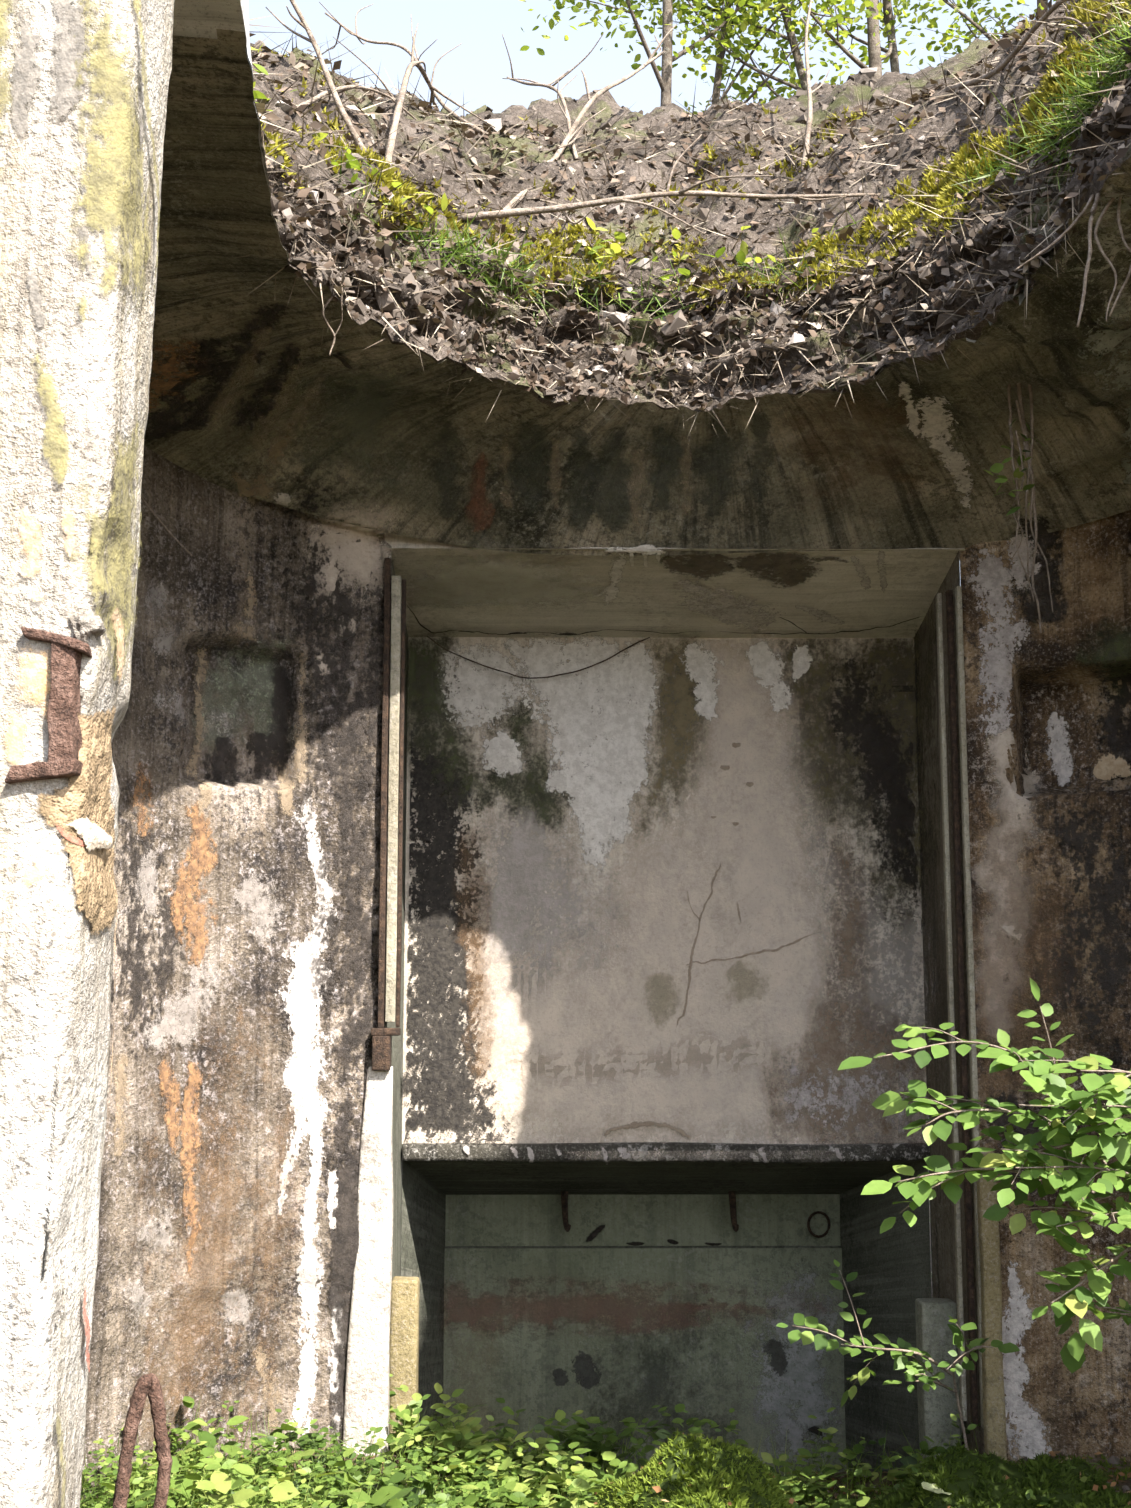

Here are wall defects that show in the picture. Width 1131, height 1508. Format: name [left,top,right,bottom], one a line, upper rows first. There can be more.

rust [24,656,51,711]
spalling [33,705,118,935]
damp [110,830,225,1156]
rust [171,802,218,967]
damp [154,646,362,1445]
damp [399,702,618,1163]
flaking render [440,635,833,1155]
damp [679,641,725,721]
crack [677,864,820,1025]
damp [746,641,813,714]
damp [967,517,1131,1079]
rust [159,1060,202,1272]